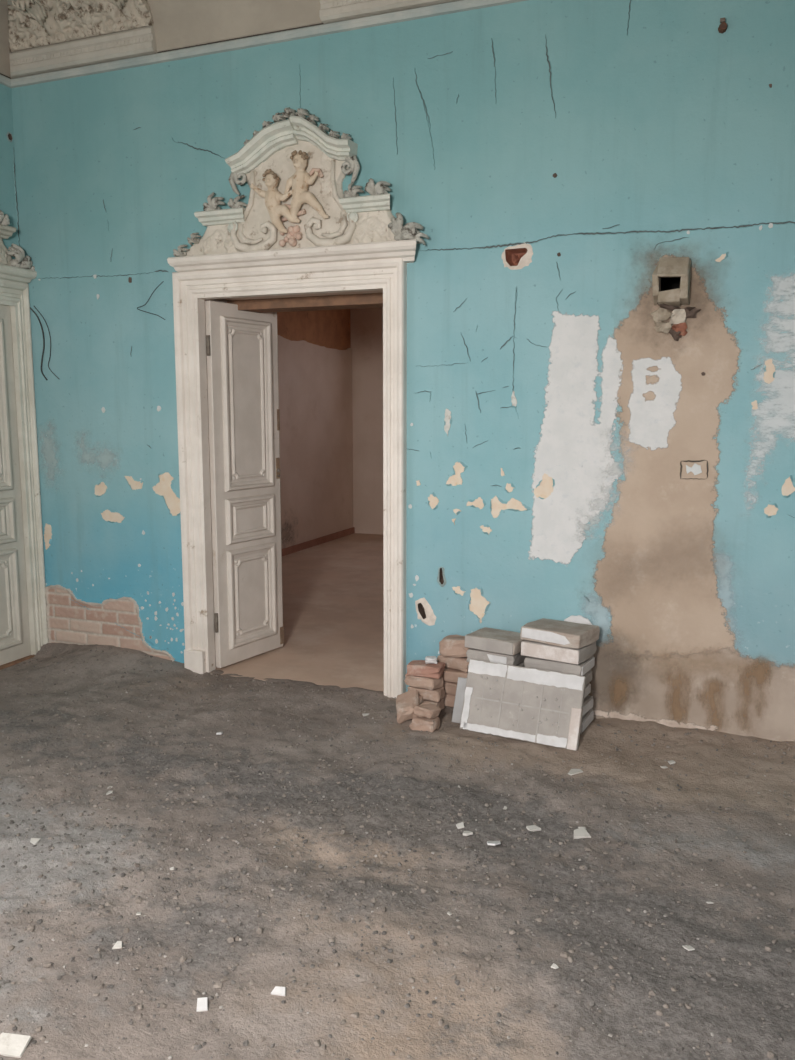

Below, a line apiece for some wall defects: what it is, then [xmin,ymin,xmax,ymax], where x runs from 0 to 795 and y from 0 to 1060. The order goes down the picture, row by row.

crack [393,51,453,167]
crack [490,41,498,98]
crack [545,34,556,118]
spalling [501,242,533,270]
crack [419,221,795,311]
crack [418,290,545,448]
peeling [452,468,555,535]
flaking render [585,267,741,660]
flaking render [45,570,184,662]
spalling [409,575,436,628]
flaking render [592,708,717,731]
water stain [588,644,795,742]